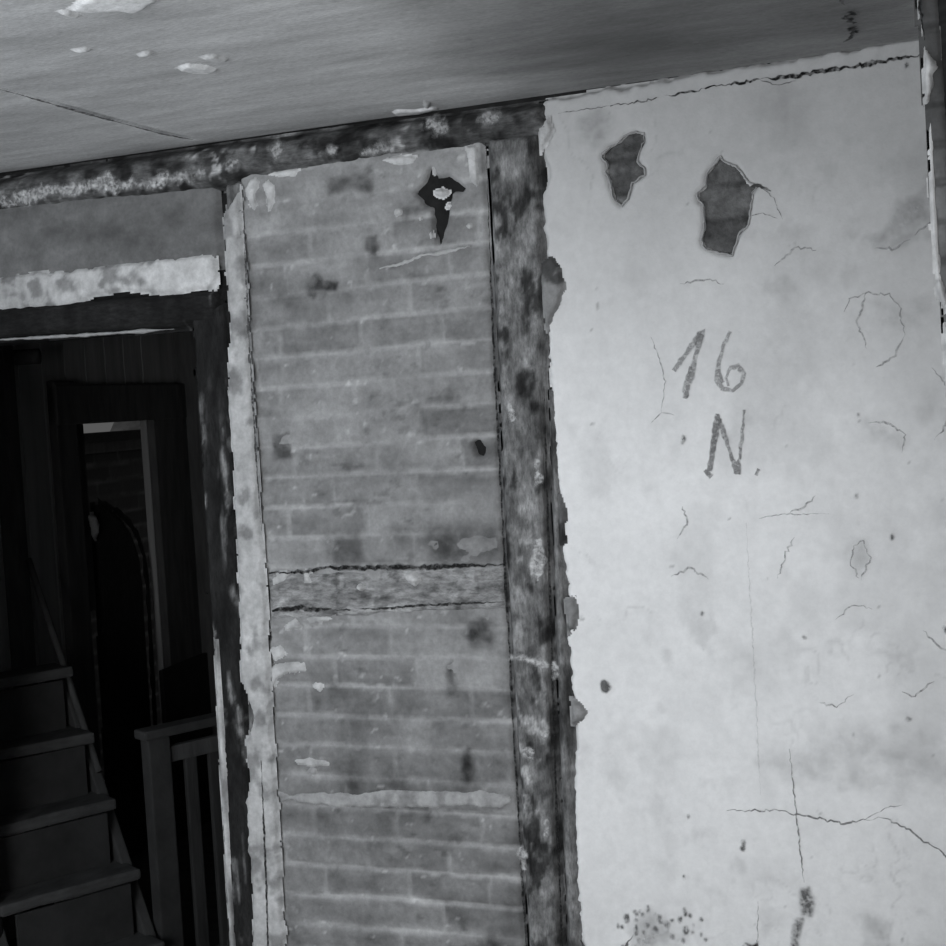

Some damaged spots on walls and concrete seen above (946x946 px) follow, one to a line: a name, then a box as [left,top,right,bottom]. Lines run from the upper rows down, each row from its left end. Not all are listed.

peeling [54,0,158,18]
peeling [482,111,499,124]
peeling [362,144,395,155]
spalling [601,131,646,206]
peeling [0,169,205,206]
spalling [433,186,452,210]
spalling [696,155,781,257]
crack [268,563,505,574]
crack [272,602,495,612]
crack [728,751,946,875]